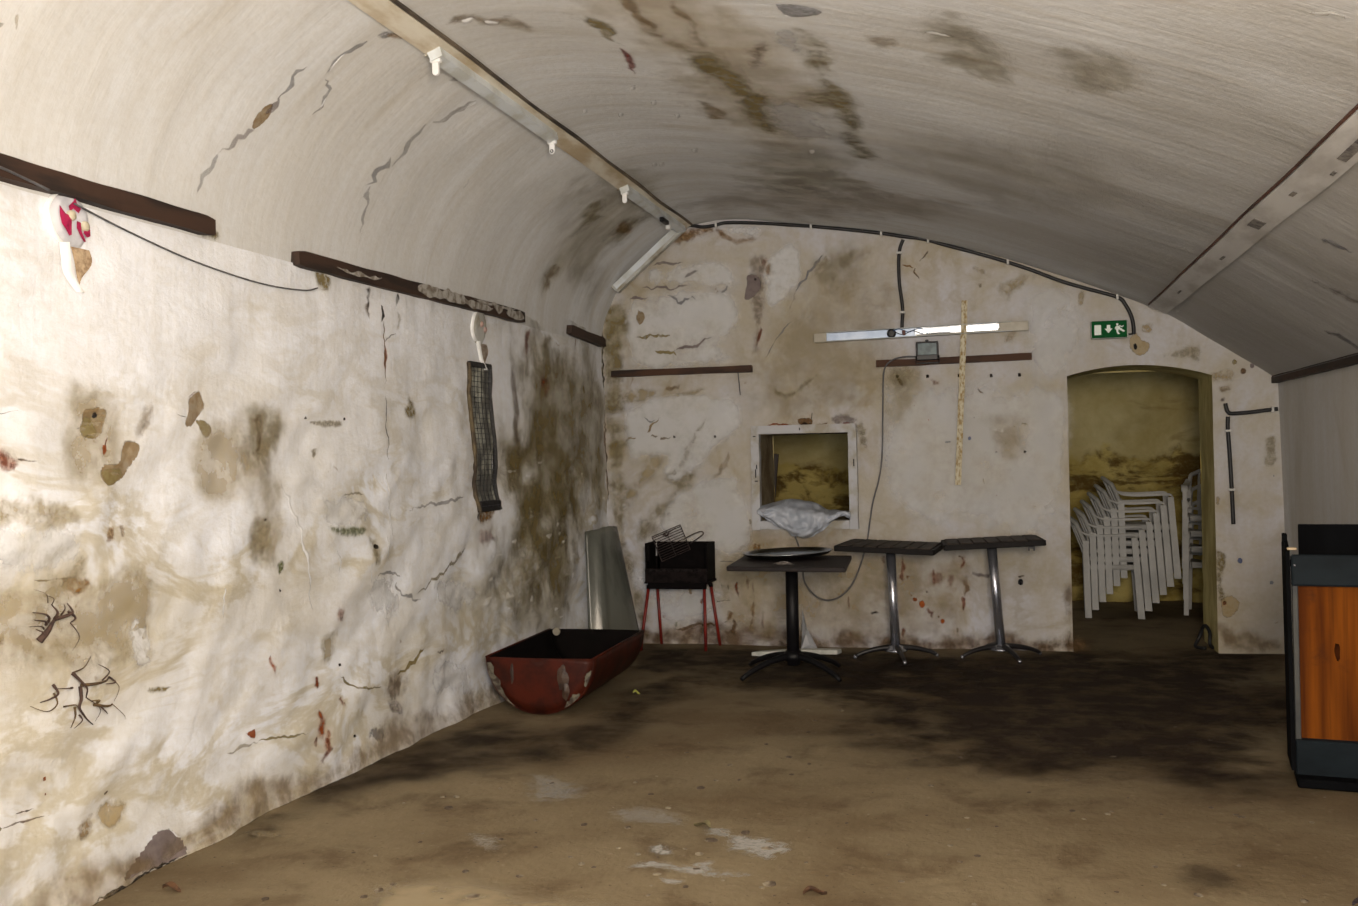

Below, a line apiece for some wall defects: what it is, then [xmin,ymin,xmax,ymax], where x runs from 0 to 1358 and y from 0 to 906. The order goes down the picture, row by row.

leakage [587,18,634,70]
leakage [623,0,652,26]
leakage [692,56,773,131]
leakage [815,82,869,158]
spalling [745,274,761,300]
spalling [80,407,139,486]
spalling [178,392,211,437]
leakage [494,307,698,607]
spalling [96,828,187,904]